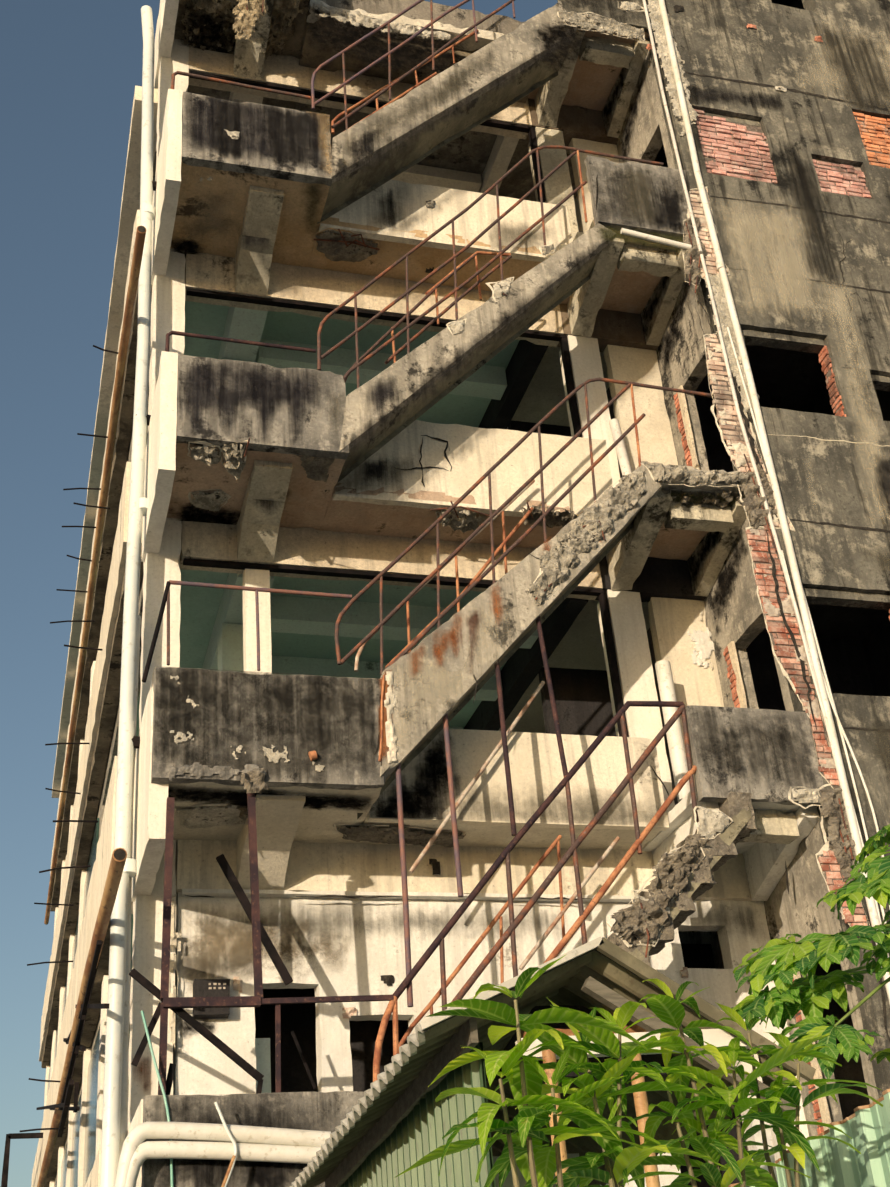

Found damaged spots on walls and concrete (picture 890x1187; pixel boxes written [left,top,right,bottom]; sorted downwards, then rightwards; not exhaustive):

spalling [181,0,451,60]
damp [187,97,329,165]
damp [691,120,702,165]
spalling [314,228,381,263]
damp [180,363,318,440]
crack [687,293,890,478]
rust [413,613,478,672]
rust [492,589,501,617]
flaking render [520,187,870,958]
crack [766,509,890,733]
damp [156,668,376,778]
mould [377,741,458,819]